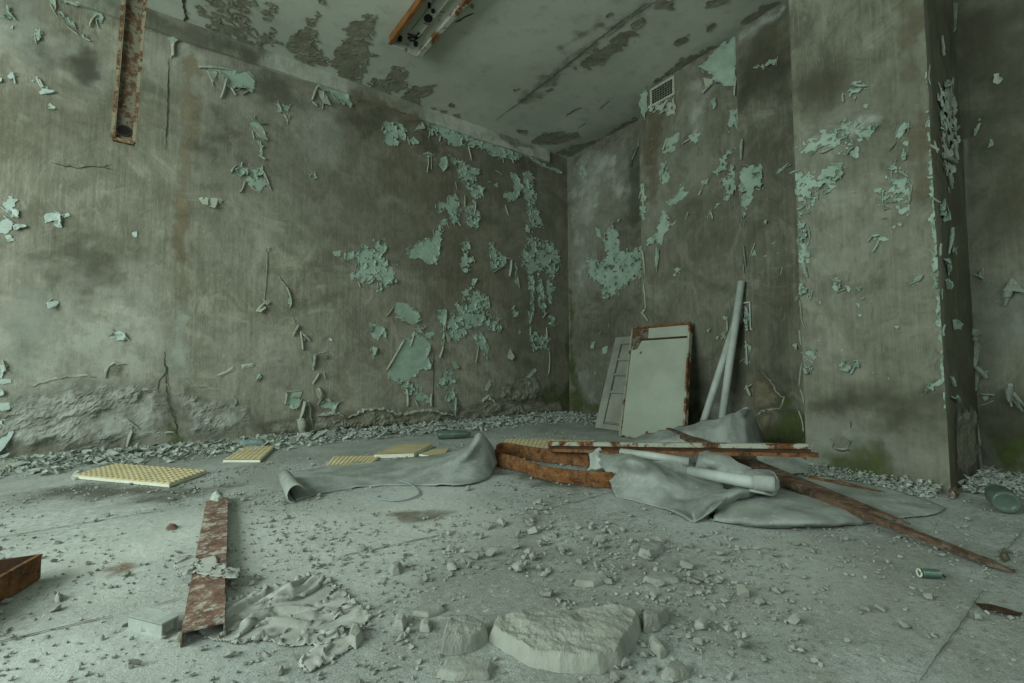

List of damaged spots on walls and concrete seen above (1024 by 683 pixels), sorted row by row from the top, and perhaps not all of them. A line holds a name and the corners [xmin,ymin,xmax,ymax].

peeling [32,76,56,110]
peeling [50,0,104,41]
crack [163,60,171,145]
peeling [194,0,460,118]
peeling [573,17,646,70]
peeling [841,81,869,108]
peeling [516,34,764,322]
peeling [867,121,913,253]
flaking render [0,115,598,478]
peeling [777,118,878,432]
flaking render [908,66,1024,500]
crack [158,353,178,436]